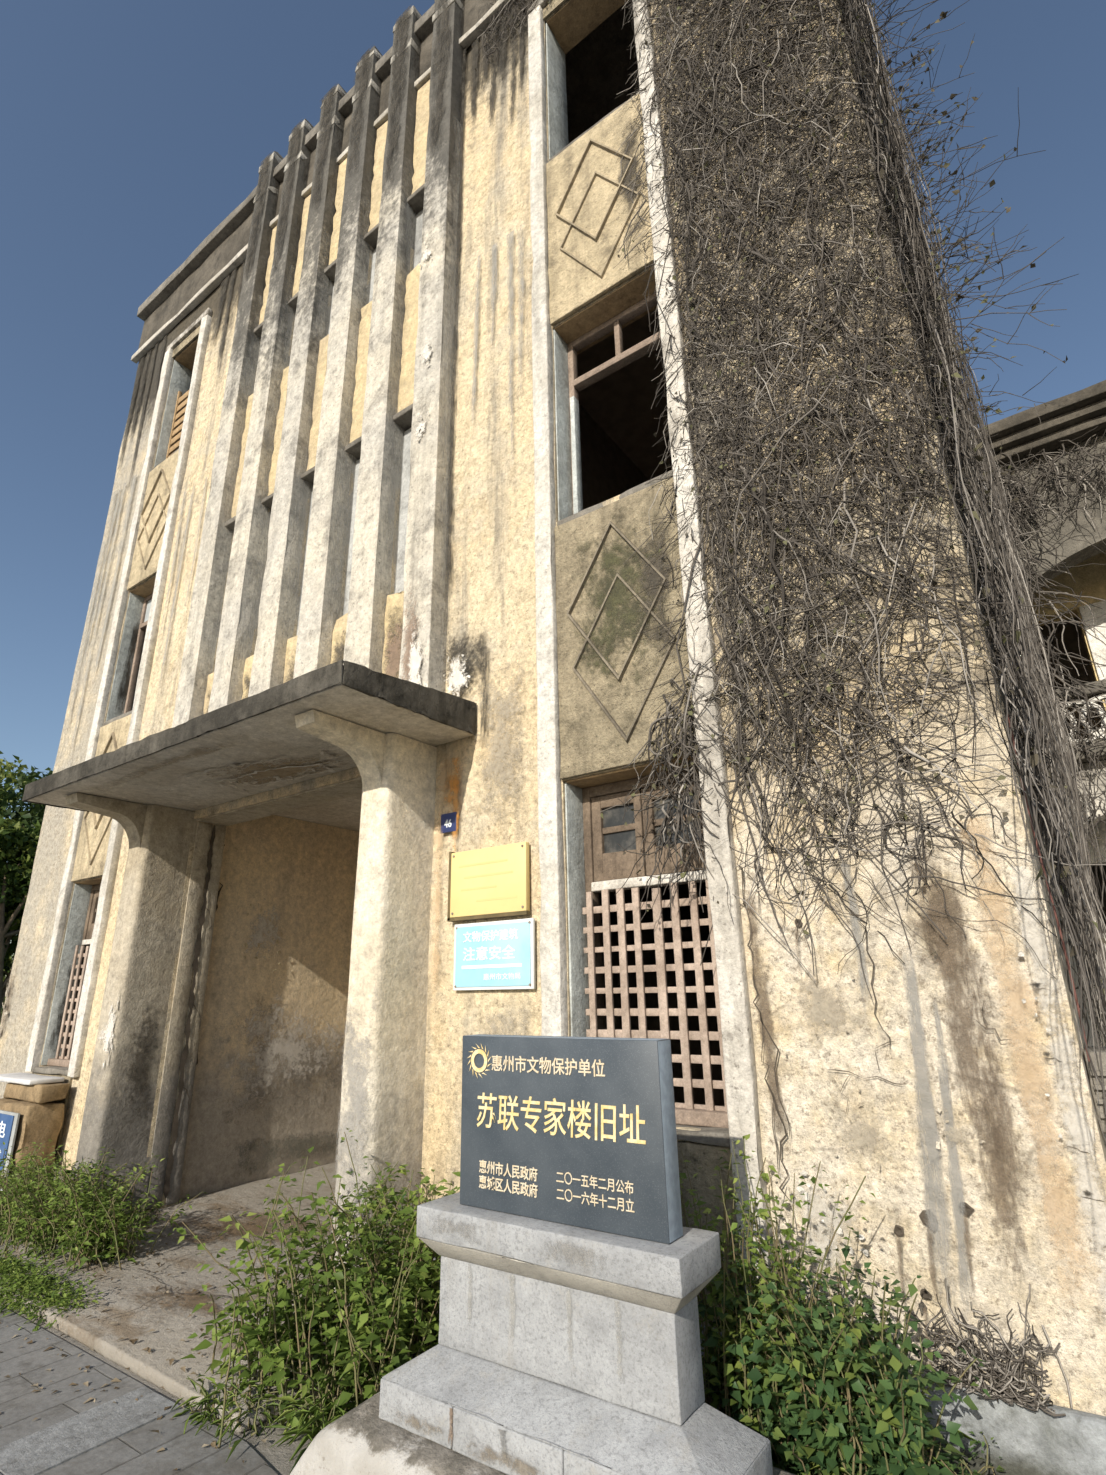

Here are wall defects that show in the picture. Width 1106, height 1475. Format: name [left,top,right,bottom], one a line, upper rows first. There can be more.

crack [163,825,225,1199]
water stain [843,867,868,988]
water stain [907,856,1025,1295]